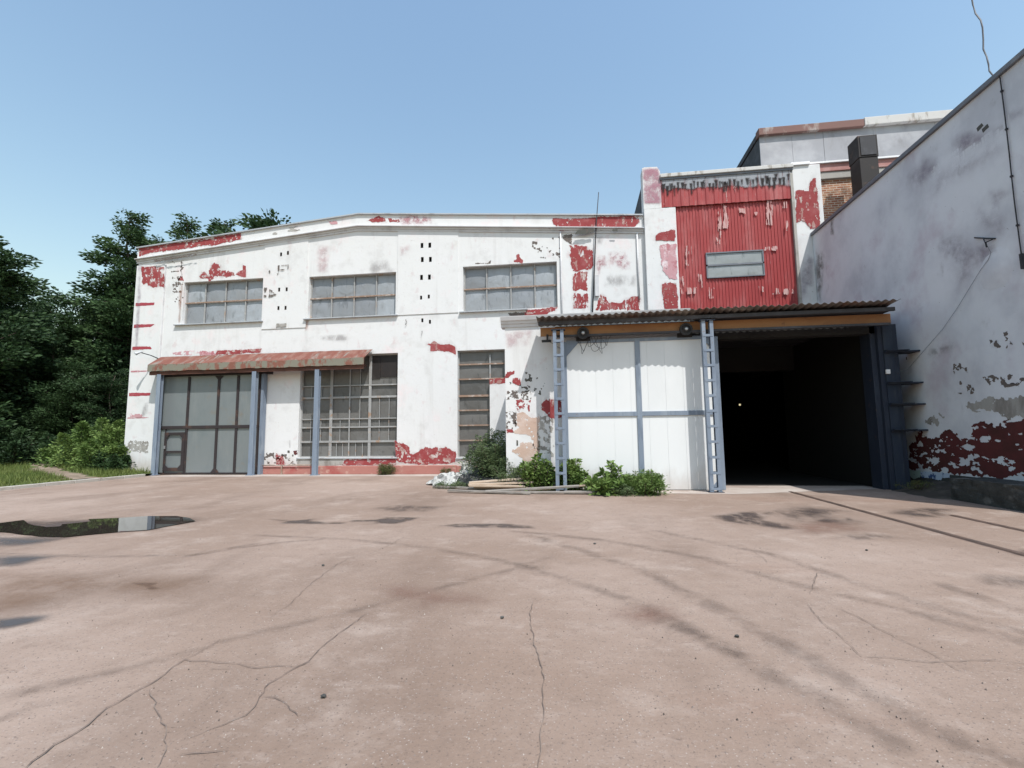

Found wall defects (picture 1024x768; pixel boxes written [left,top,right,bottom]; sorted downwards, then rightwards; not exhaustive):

peeling [795,178,820,229]
peeling [139,233,246,302]
peeling [532,216,640,311]
peeling [656,229,678,309]
peeling [428,341,456,355]
peeling [264,440,456,466]
spalling [489,371,562,470]
peeling [909,363,1024,480]